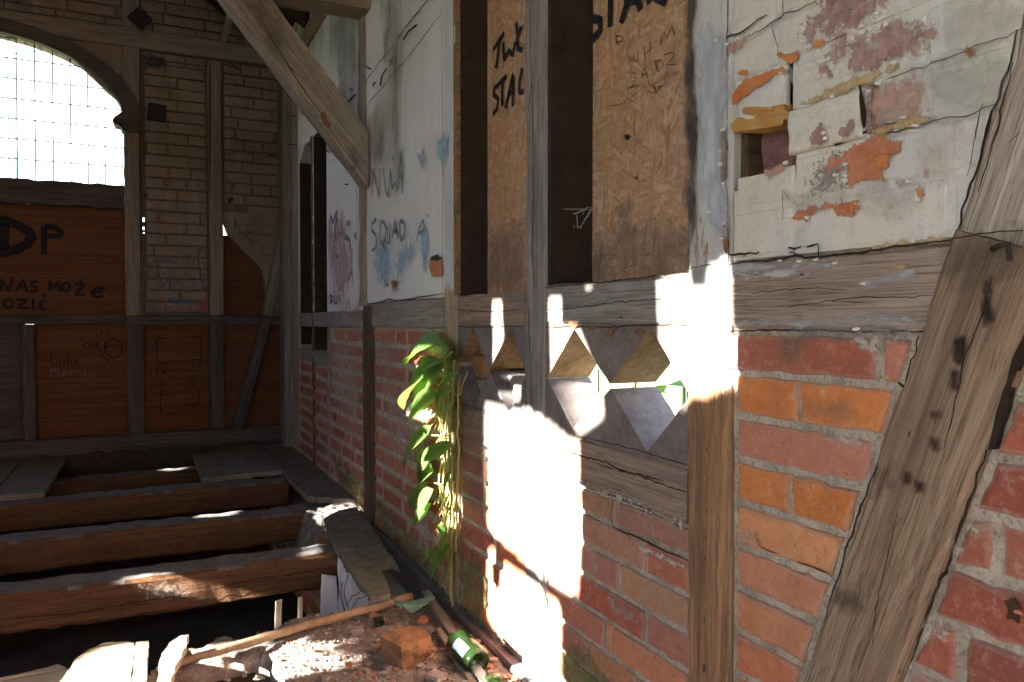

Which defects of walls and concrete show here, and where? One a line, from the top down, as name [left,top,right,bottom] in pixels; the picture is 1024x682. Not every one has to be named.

crack [726,0,816,119]
spalling [697,0,945,276]
crack [368,28,1023,642]